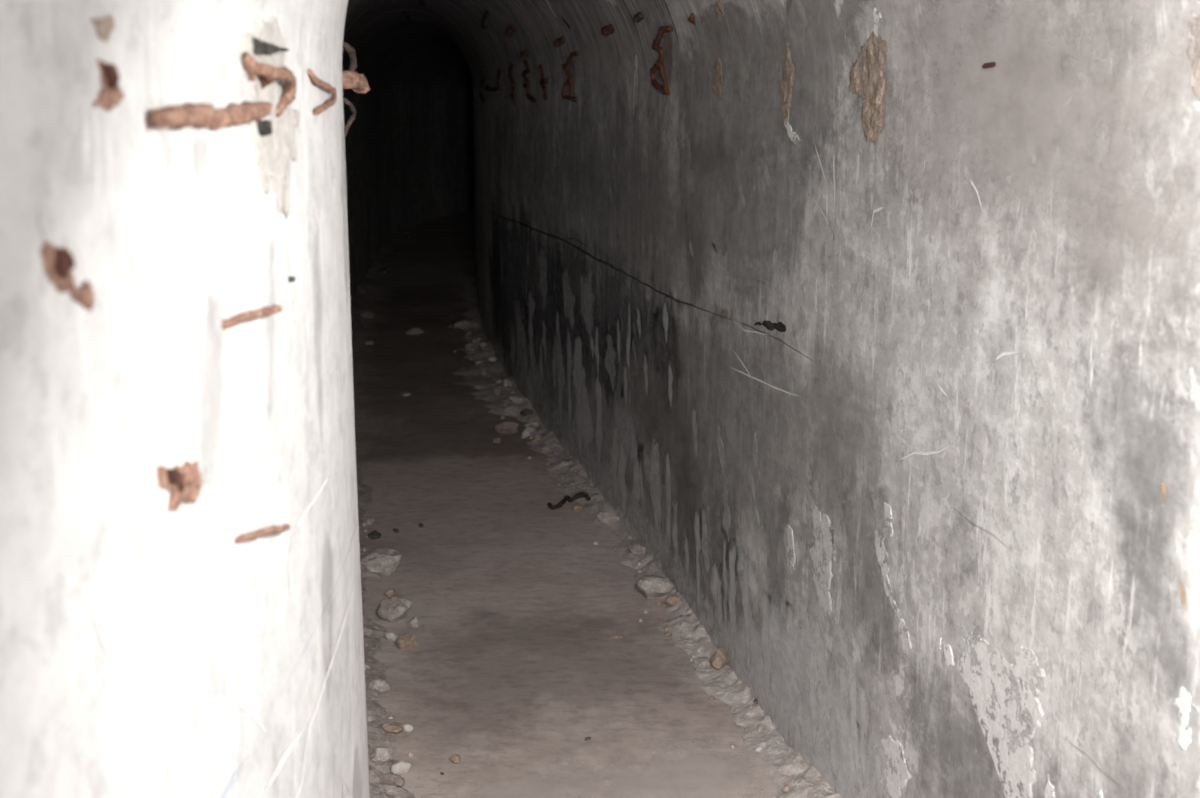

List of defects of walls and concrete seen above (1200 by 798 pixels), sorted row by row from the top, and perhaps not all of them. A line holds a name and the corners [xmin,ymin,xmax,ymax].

rust [146,101,273,131]
spalling [849,8,888,143]
spalling [1186,10,1200,100]
crack [499,215,706,311]
water stain [489,204,914,798]
peeling [936,624,1055,798]
peeling [1174,686,1200,750]